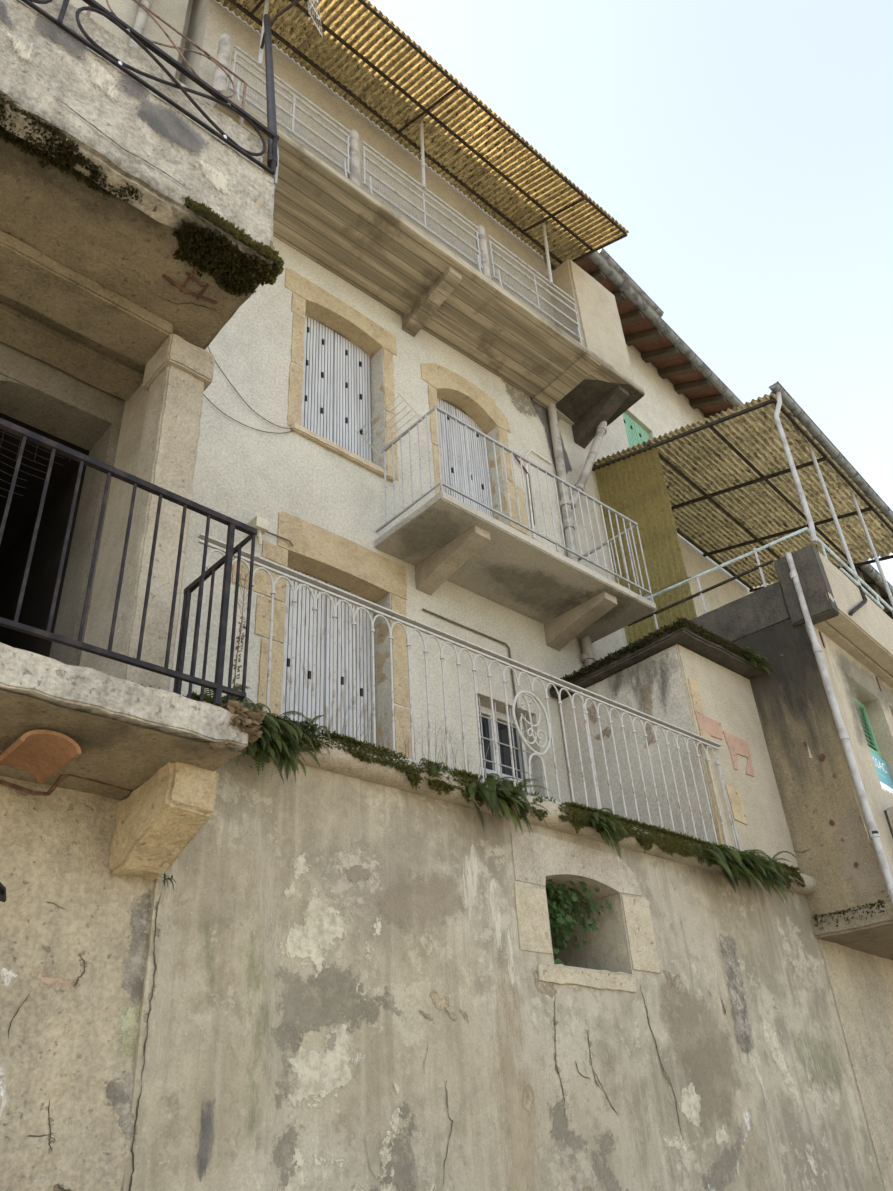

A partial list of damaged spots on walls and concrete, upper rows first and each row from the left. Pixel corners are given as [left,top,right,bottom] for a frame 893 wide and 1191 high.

peeling [277,839,383,978]
crack [73,951,87,988]
crack [30,1100,56,1154]
crack [53,1183,71,1191]
crack [129,892,162,1191]
peeling [284,1144,345,1191]
peeling [282,1023,361,1109]
peeling [379,1081,436,1191]
crack [424,1047,453,1191]
crack [552,997,618,1115]
crack [640,985,684,1139]